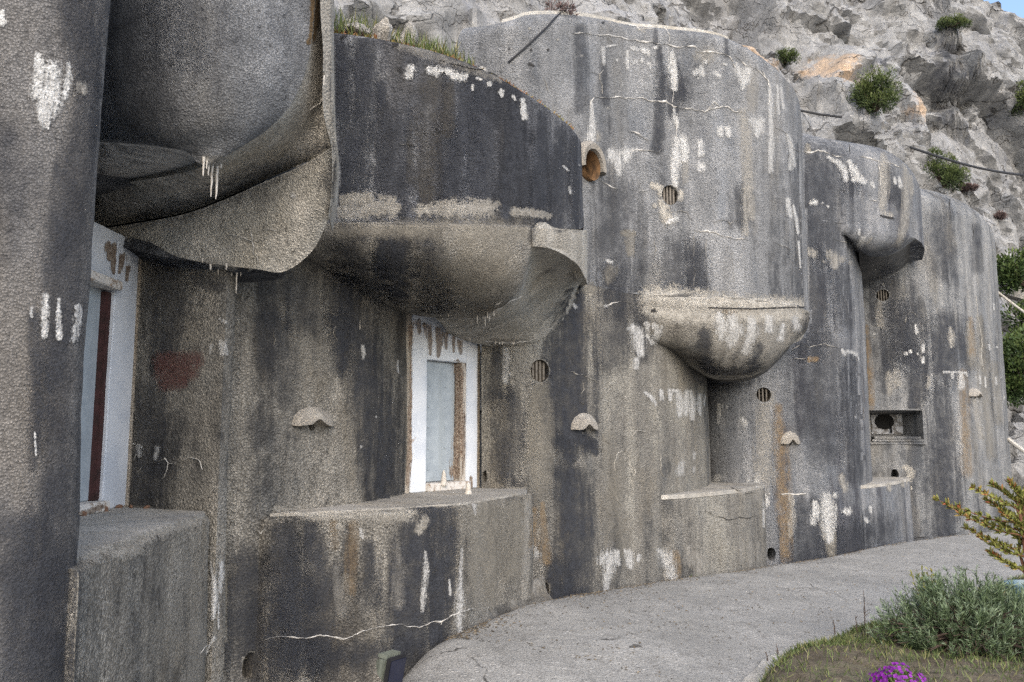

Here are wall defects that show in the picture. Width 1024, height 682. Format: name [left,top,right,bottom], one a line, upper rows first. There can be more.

leakage [30,0,101,456]
leakage [330,38,599,240]
crack [573,23,770,153]
leakage [0,460,77,680]
crack [265,608,473,640]
leakage [539,289,642,600]
leakage [787,475,893,563]